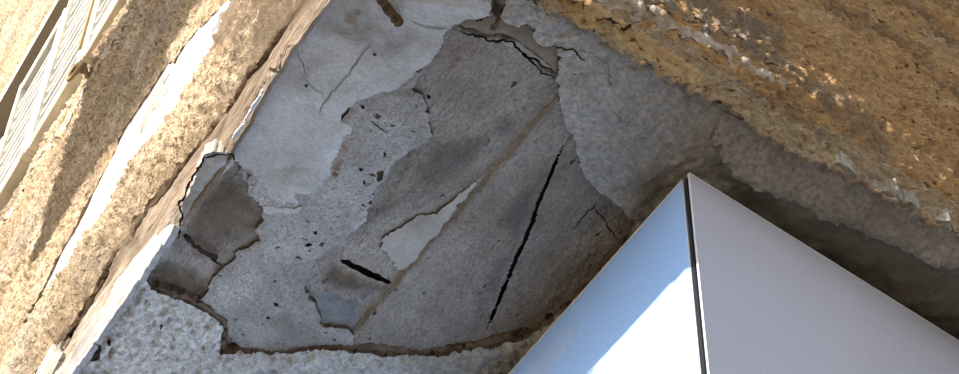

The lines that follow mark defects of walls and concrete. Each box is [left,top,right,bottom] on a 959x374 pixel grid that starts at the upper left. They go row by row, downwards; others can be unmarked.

crack [54,149,235,345]
spalling [36,0,795,374]